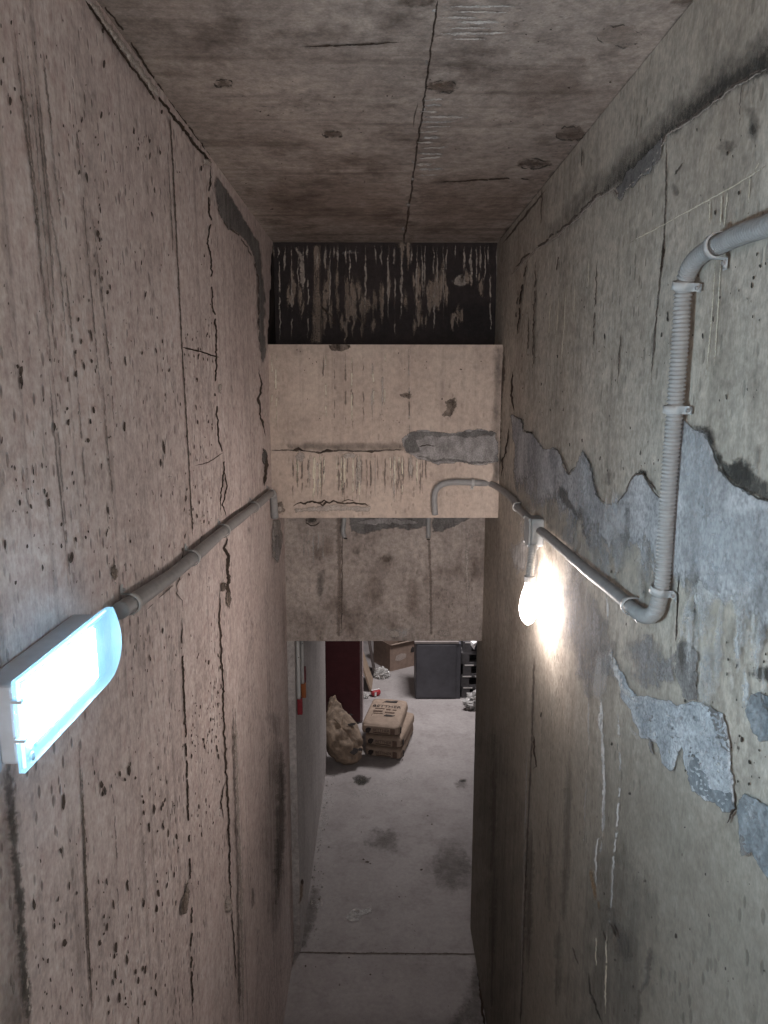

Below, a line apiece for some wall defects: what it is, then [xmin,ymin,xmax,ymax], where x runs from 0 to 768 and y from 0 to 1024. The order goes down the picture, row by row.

crack [402,1,438,243]
water stain [273,246,497,332]
crack [86,1,236,976]
crack [294,499,371,512]